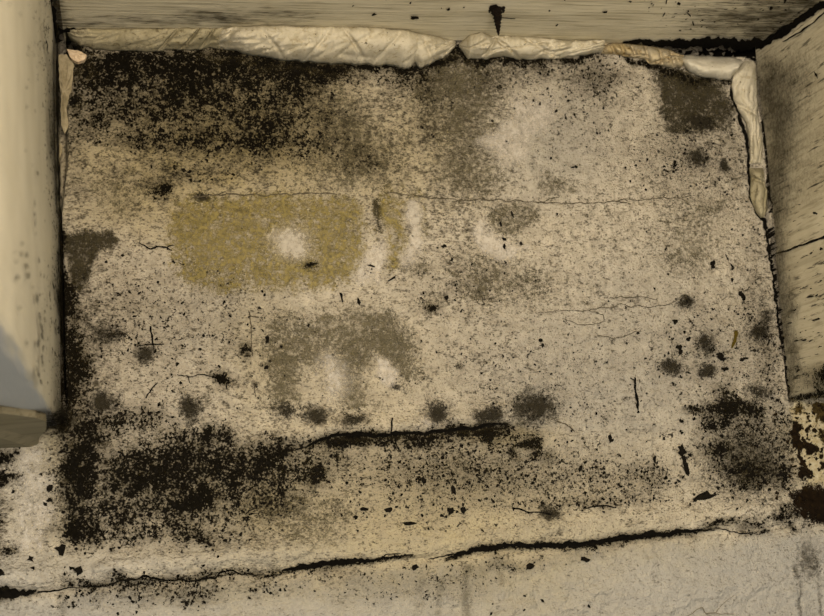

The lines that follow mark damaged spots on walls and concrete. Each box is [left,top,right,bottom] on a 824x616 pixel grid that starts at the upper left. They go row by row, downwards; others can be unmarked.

water stain [666,0,817,39]
water stain [27,0,749,558]
water stain [623,213,824,536]
water stain [0,447,24,487]
crack [295,418,509,450]
peeling [757,390,824,518]
rust [787,483,824,528]
water stain [41,561,417,616]
crack [0,527,760,601]
water stain [422,557,536,608]